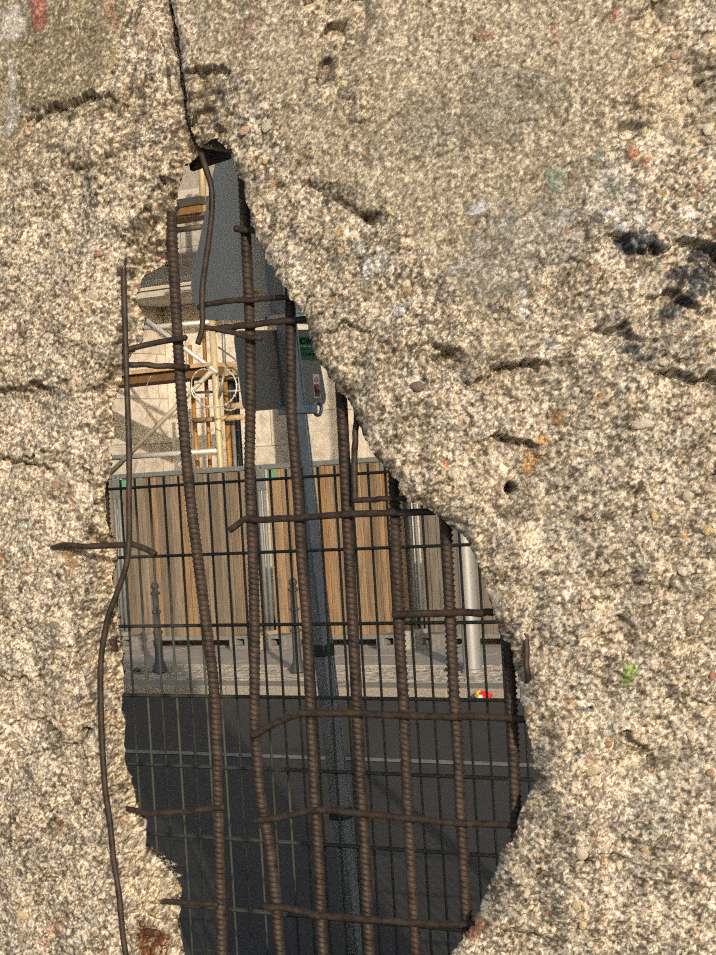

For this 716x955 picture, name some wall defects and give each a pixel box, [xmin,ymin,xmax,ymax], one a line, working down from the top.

crack [159,35,173,96]
peeling [466,202,491,215]
peeling [353,238,395,283]
peeling [518,278,528,320]
spalling [438,345,550,399]
spalling [472,432,578,520]
rust [138,923,170,955]